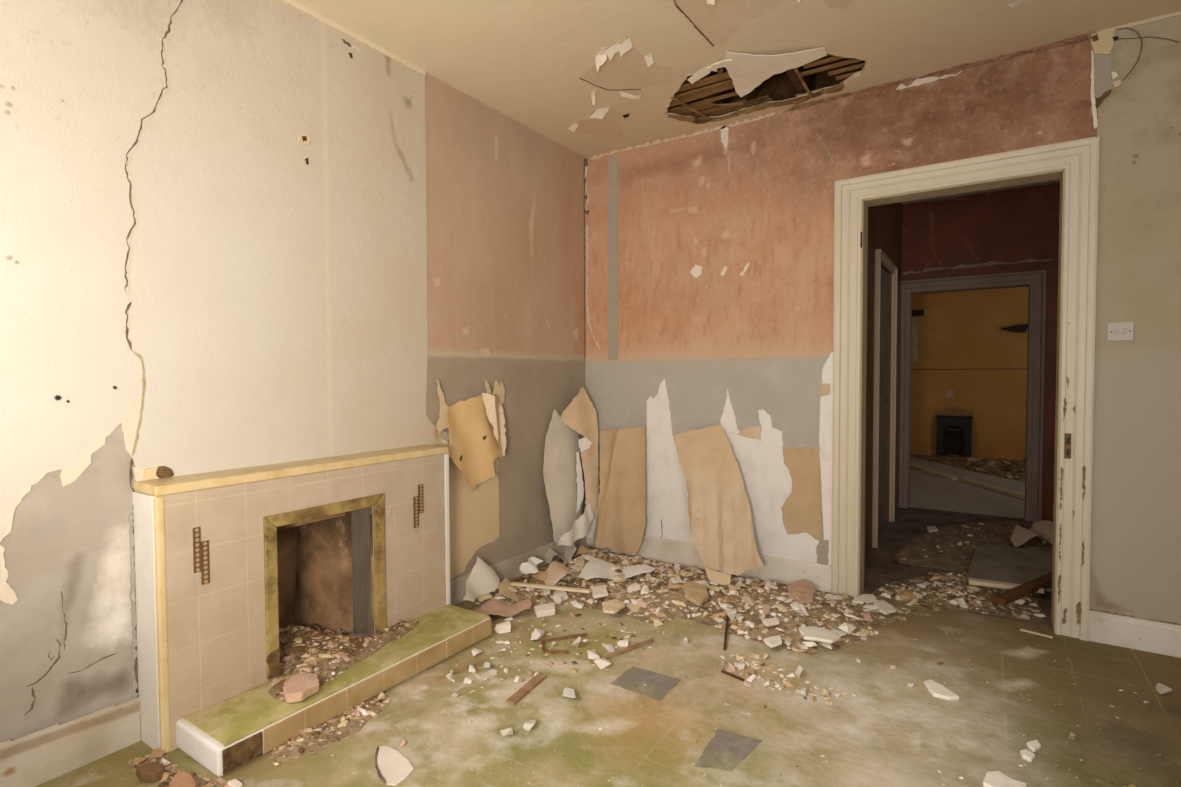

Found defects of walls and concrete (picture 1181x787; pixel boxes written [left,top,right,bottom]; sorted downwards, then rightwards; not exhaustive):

peeling [568,39,844,138]
peeling [672,0,800,46]
flaking render [1090,29,1122,129]
crack [24,0,183,716]
peeling [816,352,833,565]
flaking render [0,401,175,743]
water stain [40,509,137,730]